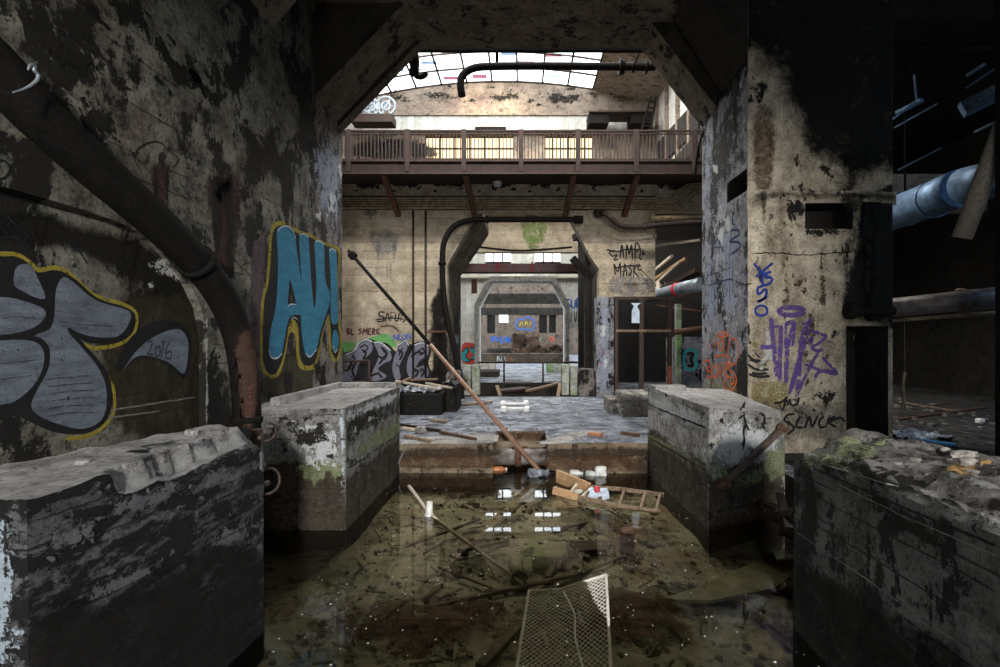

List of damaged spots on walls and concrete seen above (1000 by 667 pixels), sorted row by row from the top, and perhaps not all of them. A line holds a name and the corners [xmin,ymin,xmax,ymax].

rust [151,163,171,207]
rust [753,105,775,190]
crack [753,247,849,266]
crack [739,402,771,450]
spalling [46,431,264,562]
peeling [0,516,26,664]
peeling [86,564,154,609]
leakage [29,426,501,667]